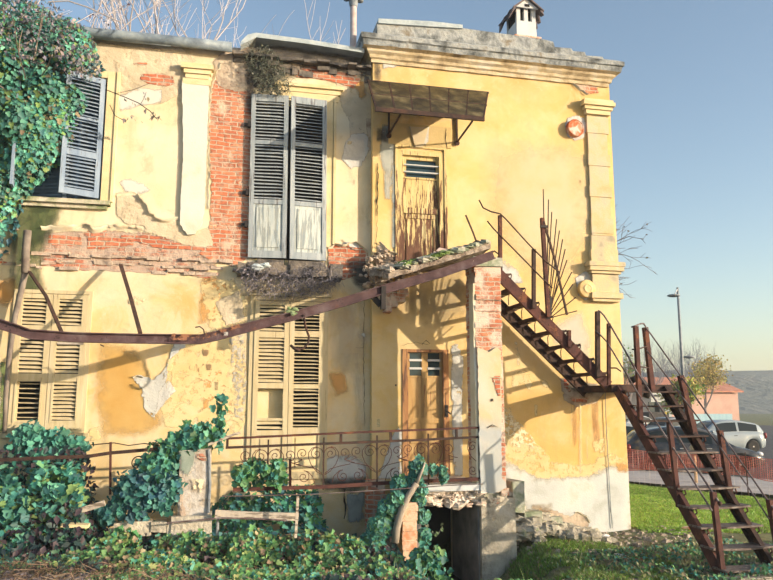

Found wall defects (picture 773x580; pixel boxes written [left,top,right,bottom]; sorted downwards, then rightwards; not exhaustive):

flaking render [295,67,371,169]
spalling [573,83,599,95]
spalling [40,42,255,441]
peeling [512,342,548,389]
spalling [559,376,604,407]
flaking render [504,408,631,532]